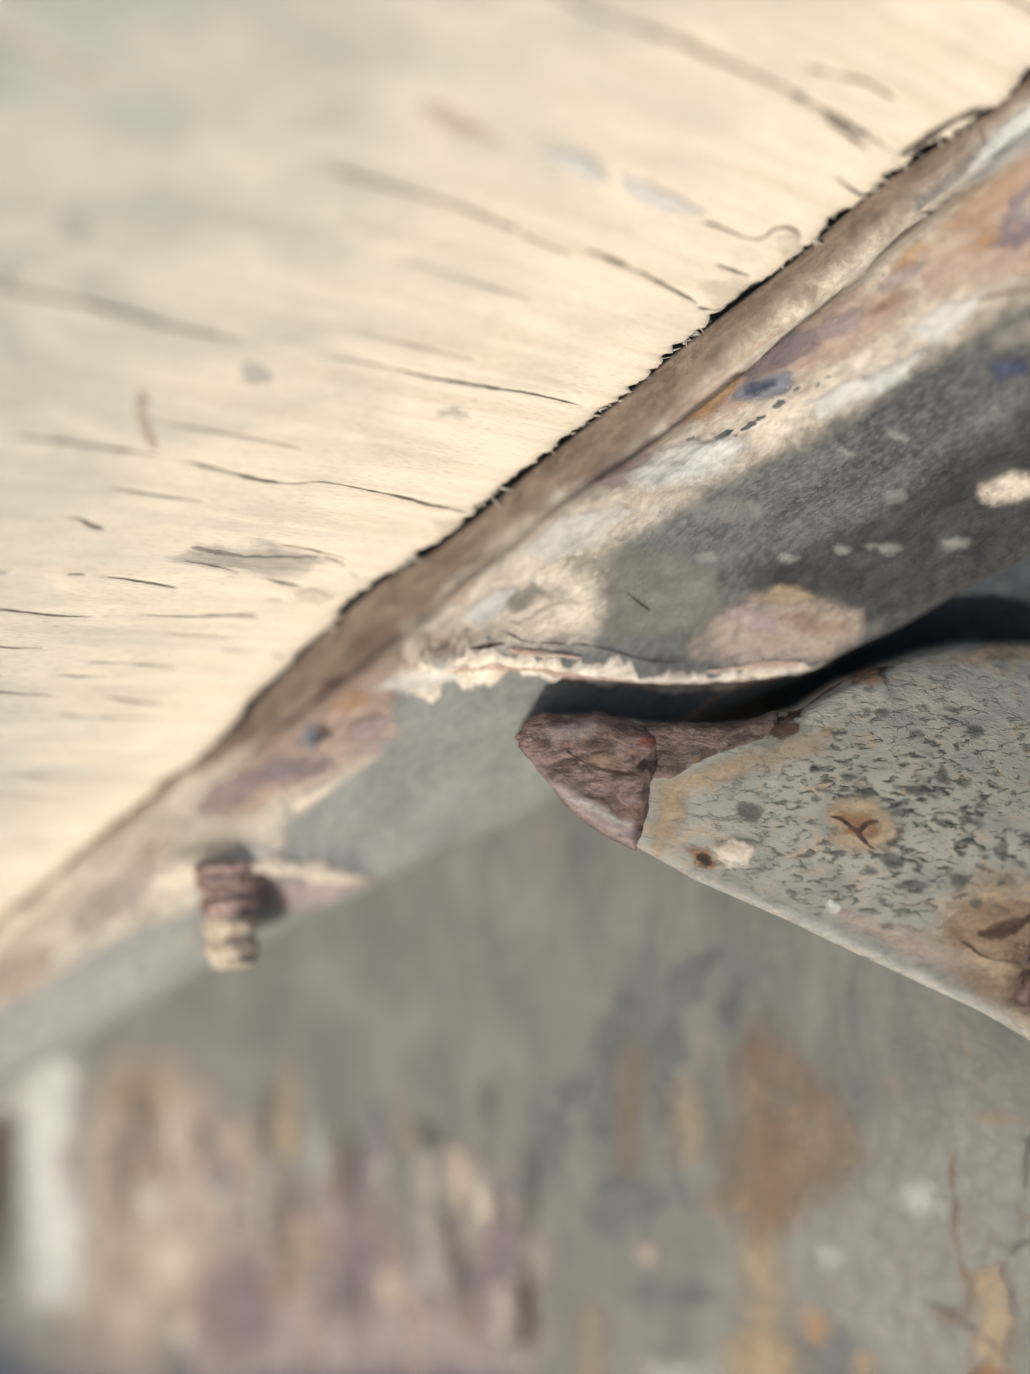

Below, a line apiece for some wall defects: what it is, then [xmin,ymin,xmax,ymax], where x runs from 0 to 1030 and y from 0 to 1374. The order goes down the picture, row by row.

crack [328,331,573,404]
peeling [394,103,1030,663]
crack [14,420,464,512]
crack [0,609,80,617]
crack [68,561,300,658]
rust [642,585,893,779]
peeling [739,805,761,822]
rust [828,799,897,852]
peeling [865,765,969,890]
rust [938,879,1030,1029]
peeling [0,748,366,1307]
rust [972,1269,1012,1374]